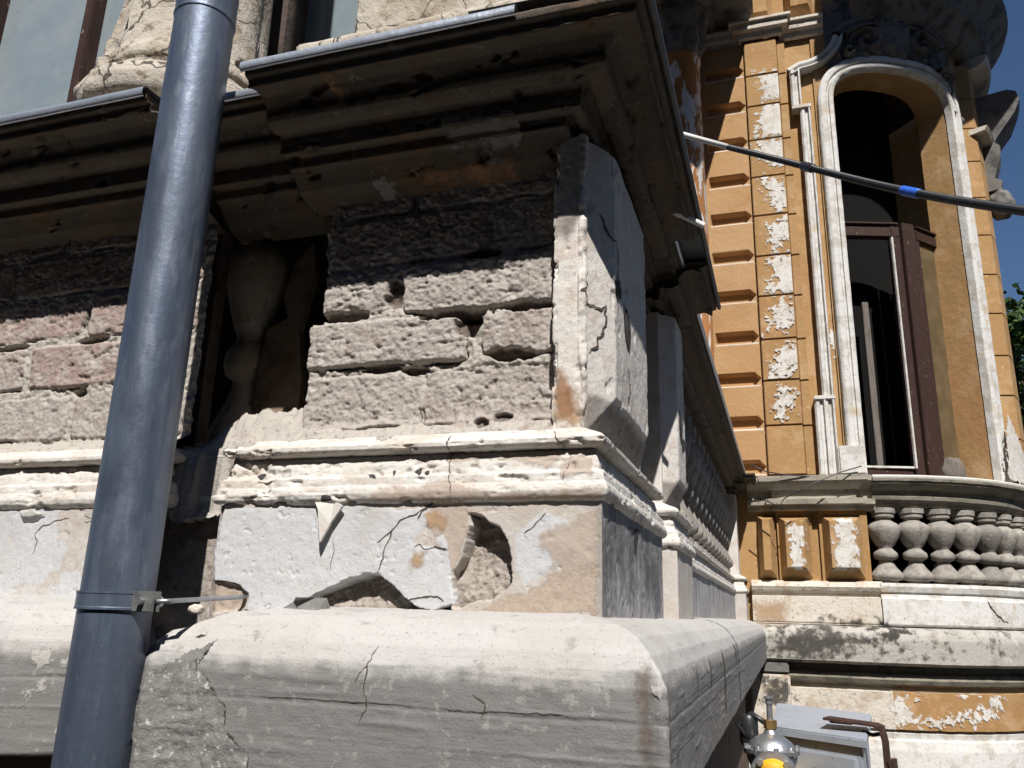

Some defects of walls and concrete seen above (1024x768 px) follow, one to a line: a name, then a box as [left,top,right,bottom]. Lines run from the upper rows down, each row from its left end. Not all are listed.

peeling [750,68,800,422]
crack [580,214,619,353]
corrosion [553,369,580,426]
peeling [315,495,344,542]
crack [377,436,481,573]
peeling [322,450,603,616]
peeling [786,521,809,570]
peeling [830,512,879,581]
spalling [893,539,909,583]
leakage [766,614,912,661]
crack [259,646,414,722]
peeling [886,693,1007,731]